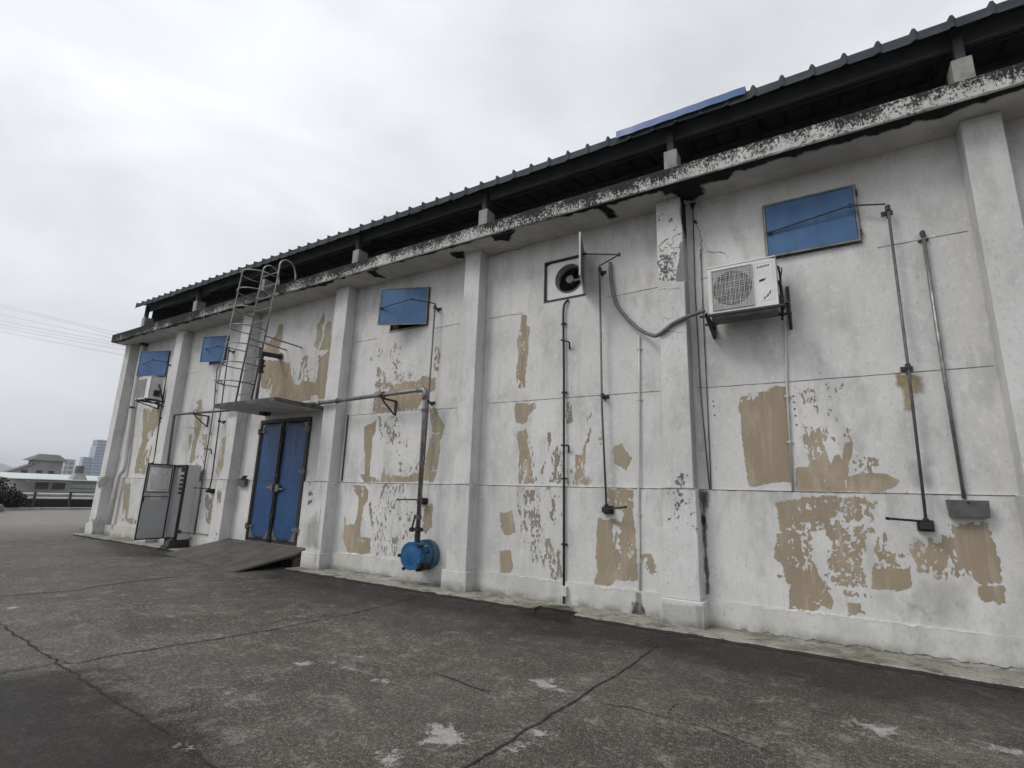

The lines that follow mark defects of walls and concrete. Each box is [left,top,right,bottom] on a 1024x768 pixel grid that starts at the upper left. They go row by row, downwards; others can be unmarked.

mould [112,84,1024,343]
peeling [261,313,331,402]
peeling [516,314,530,388]
peeling [122,407,161,524]
peeling [342,342,445,558]
peeling [499,403,602,583]
peeling [586,488,657,591]
leakage [667,473,709,594]
peeling [738,383,1006,635]